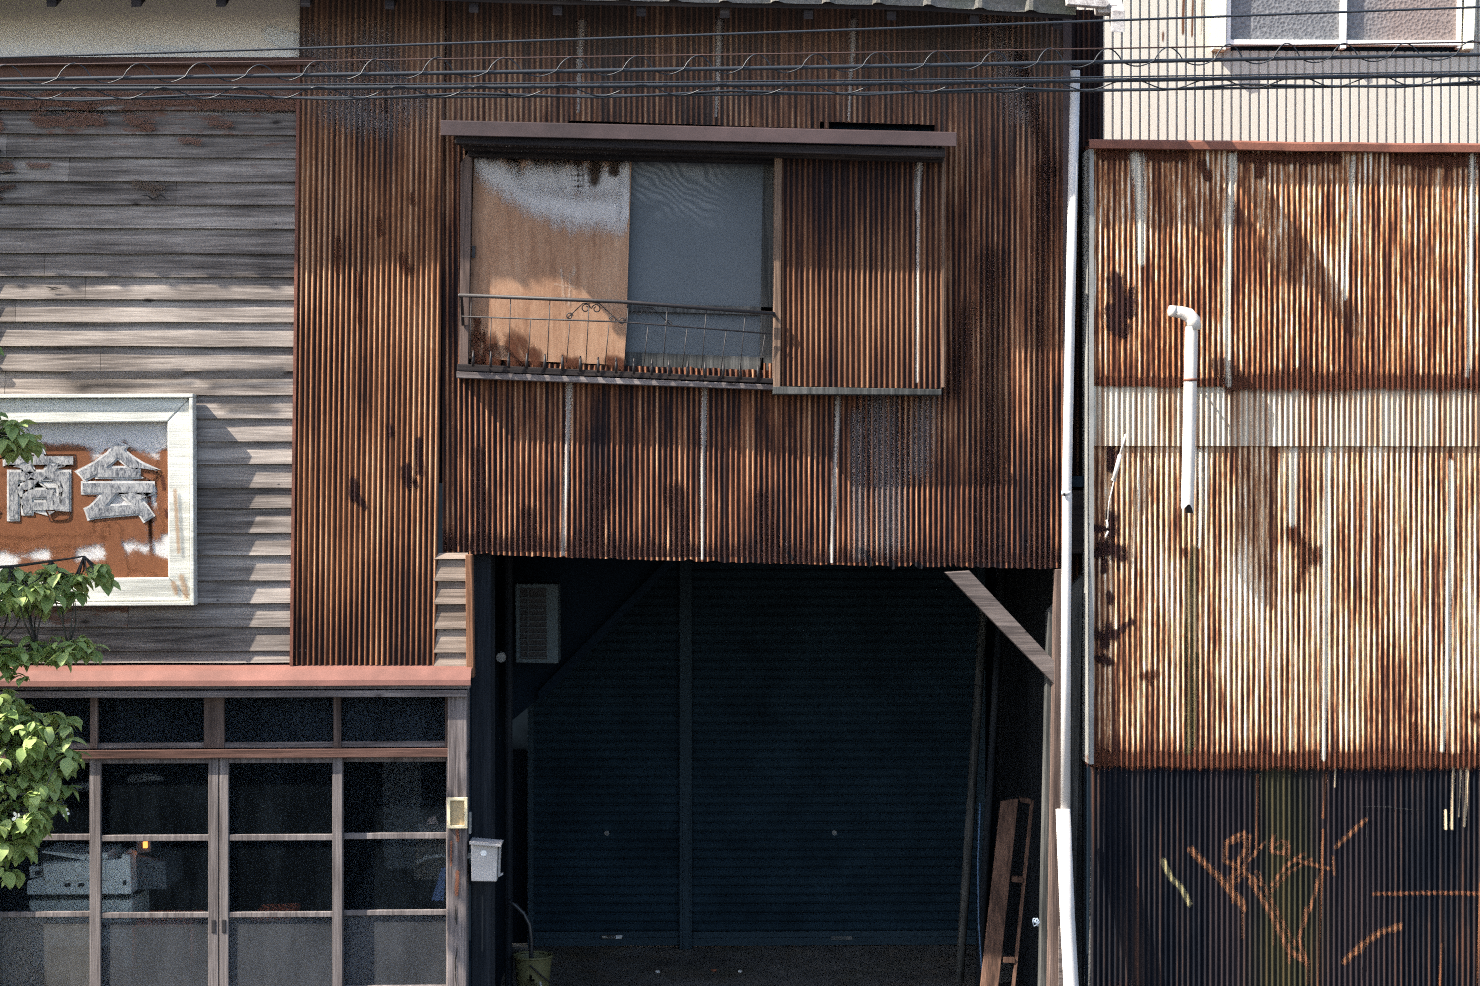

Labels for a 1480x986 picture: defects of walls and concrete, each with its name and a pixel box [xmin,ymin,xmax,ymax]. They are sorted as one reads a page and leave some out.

rust [1182,0,1202,37]
rust [1095,149,1211,182]
rust [1237,151,1342,179]
rust [1393,153,1480,170]
rust [443,57,1060,568]
rust [1104,271,1136,339]
rust [1097,367,1480,393]
rust [400,437,424,491]
rust [1107,446,1119,473]
rust [1287,523,1322,593]
rust [1094,510,1135,667]
rust [1086,711,1480,986]